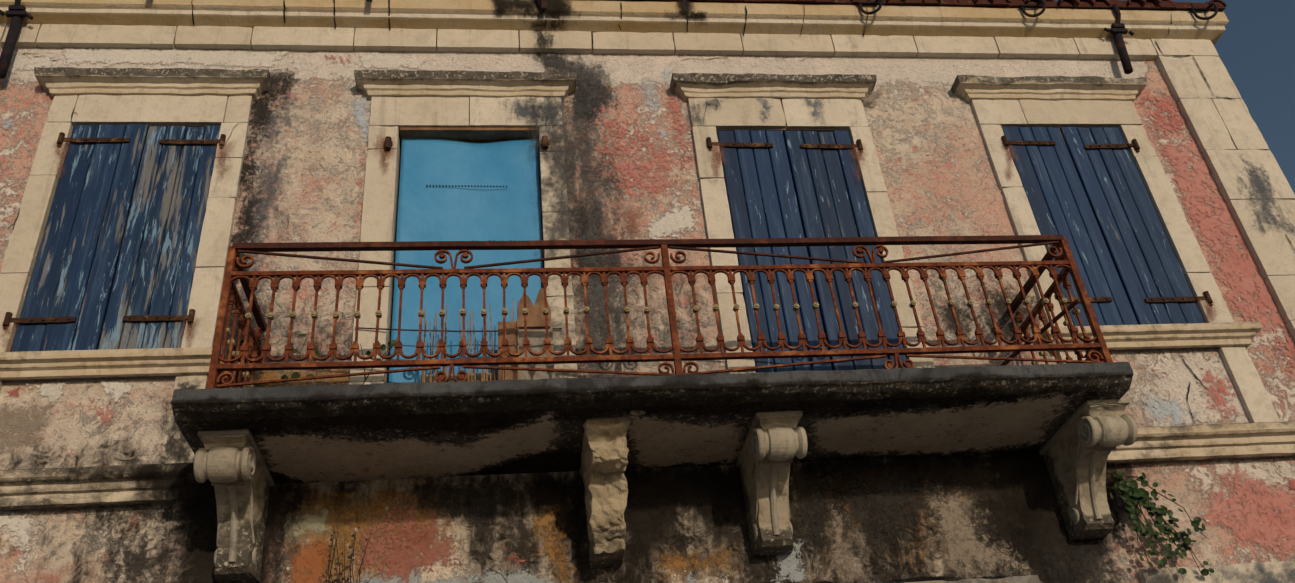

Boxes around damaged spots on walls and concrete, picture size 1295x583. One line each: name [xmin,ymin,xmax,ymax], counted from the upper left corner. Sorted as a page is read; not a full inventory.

damp [667,0,706,21]
damp [223,69,297,357]
damp [492,0,636,374]
damp [1239,160,1295,233]
peeling [0,381,66,454]
peeling [80,378,133,428]
rust [261,369,350,387]
peeling [0,511,35,576]
flaking render [255,412,576,583]
damp [67,381,1118,583]
damp [790,447,1186,583]
peeling [1203,467,1295,561]